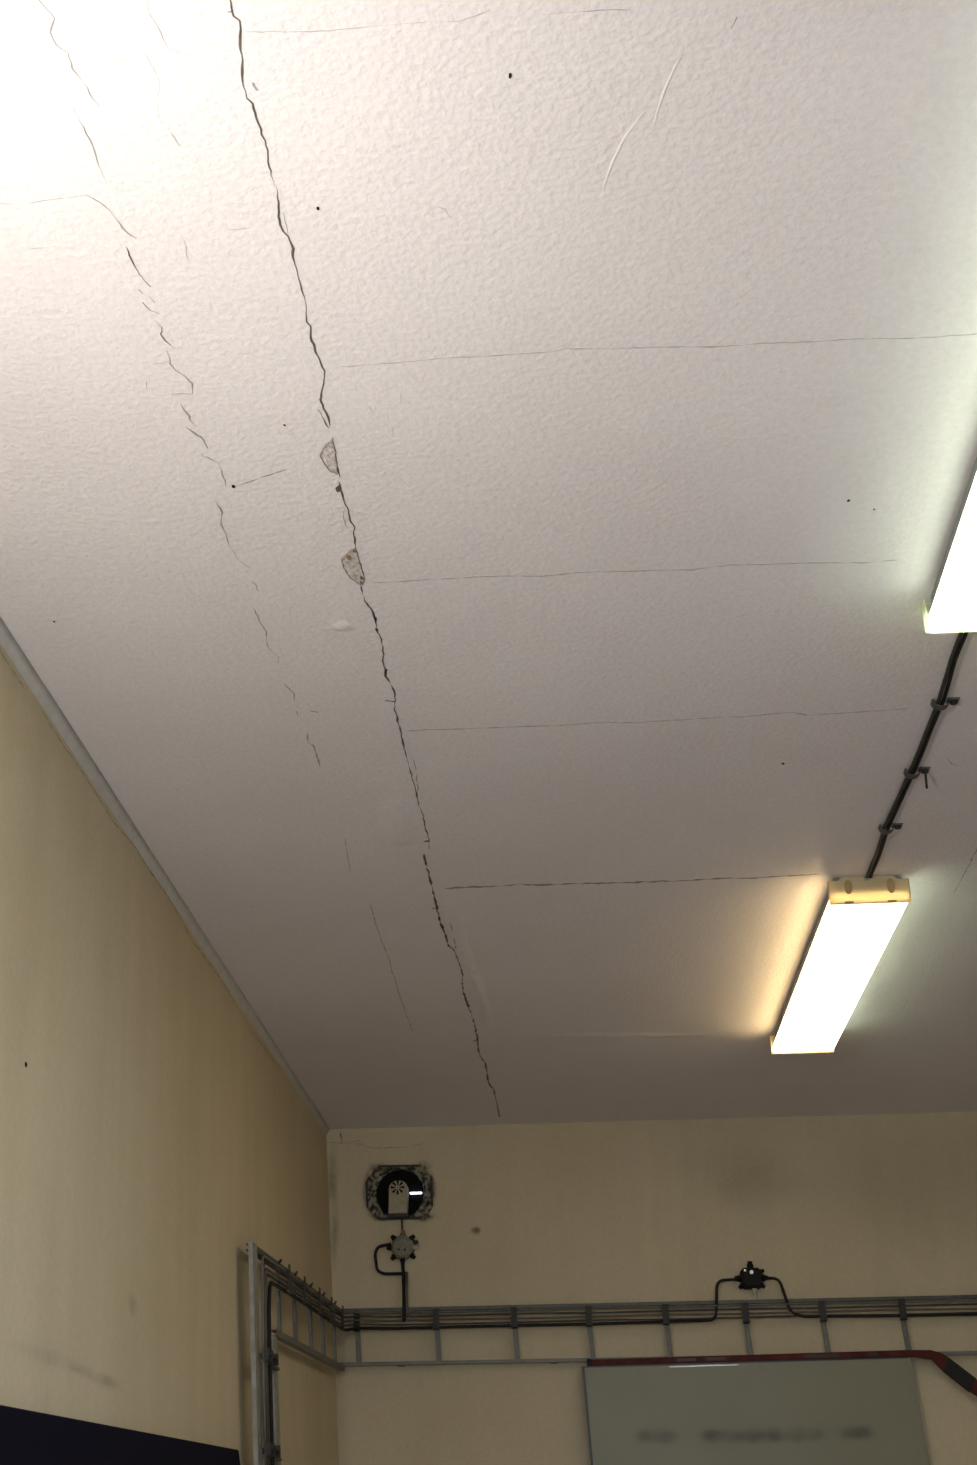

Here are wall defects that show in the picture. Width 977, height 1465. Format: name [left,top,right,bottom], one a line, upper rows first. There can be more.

crack [0,0,320,766]
flaking render [319,439,341,492]
flaking render [341,547,365,586]
crack [227,0,977,1117]